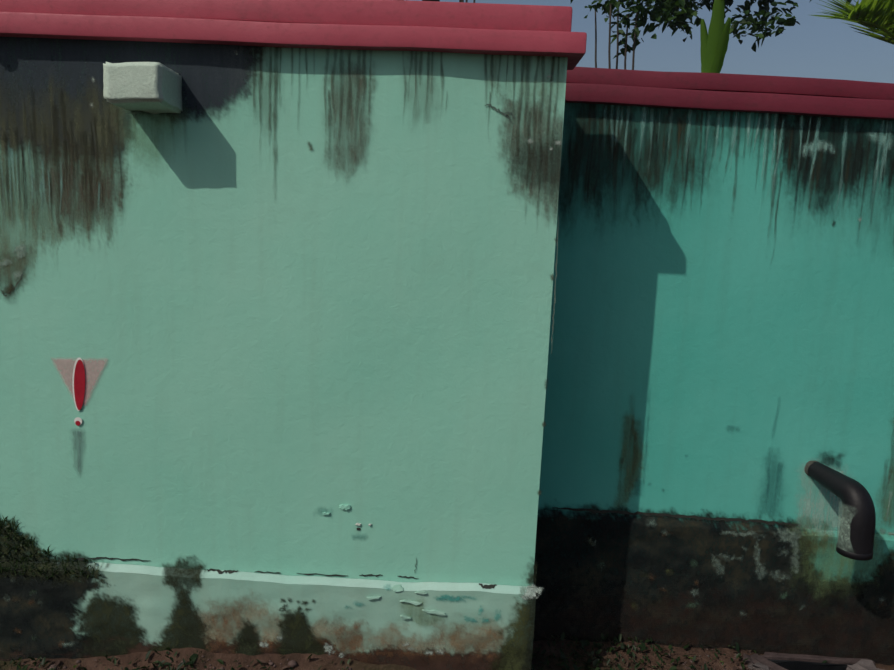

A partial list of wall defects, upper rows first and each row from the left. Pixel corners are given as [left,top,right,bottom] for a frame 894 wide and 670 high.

leakage [0,37,262,258]
leakage [505,100,631,211]
leakage [731,113,894,200]
crack [479,582,497,590]
leakage [533,487,894,665]